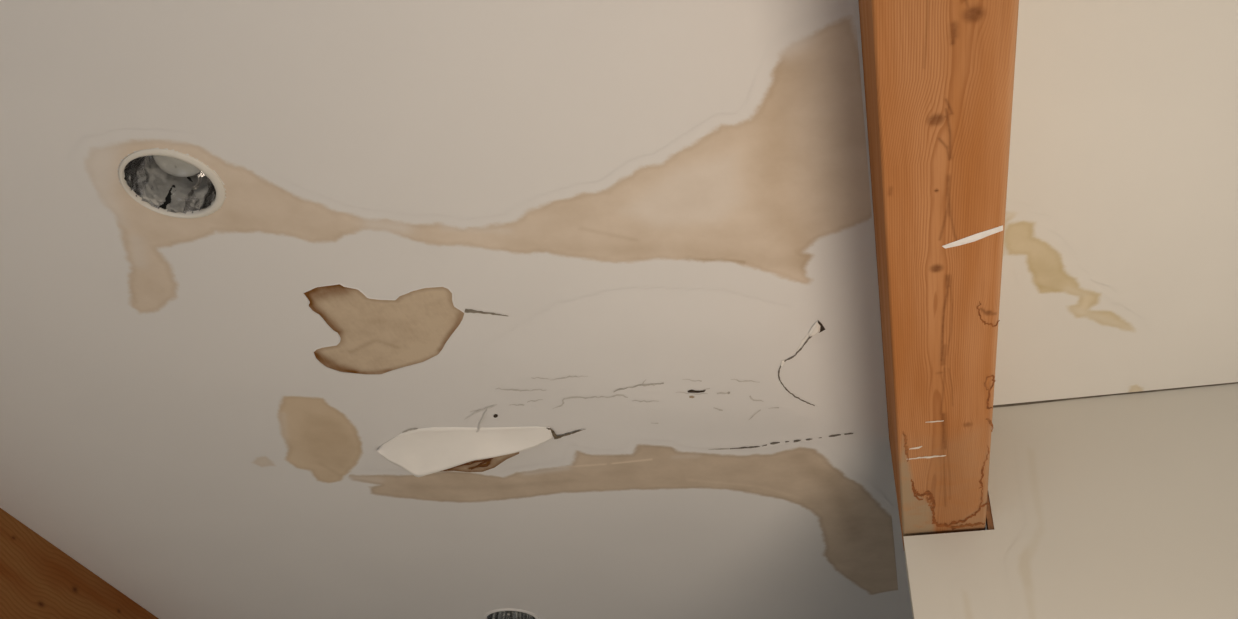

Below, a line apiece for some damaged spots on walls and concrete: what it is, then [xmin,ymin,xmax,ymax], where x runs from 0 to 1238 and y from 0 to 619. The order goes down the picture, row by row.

damp [68,4,872,321]
peeling [302,283,507,375]
peeling [377,405,585,477]
damp [248,390,898,598]
crack [471,321,853,450]
damp [911,445,989,530]
damp [984,375,995,431]
damp [1002,200,1151,340]